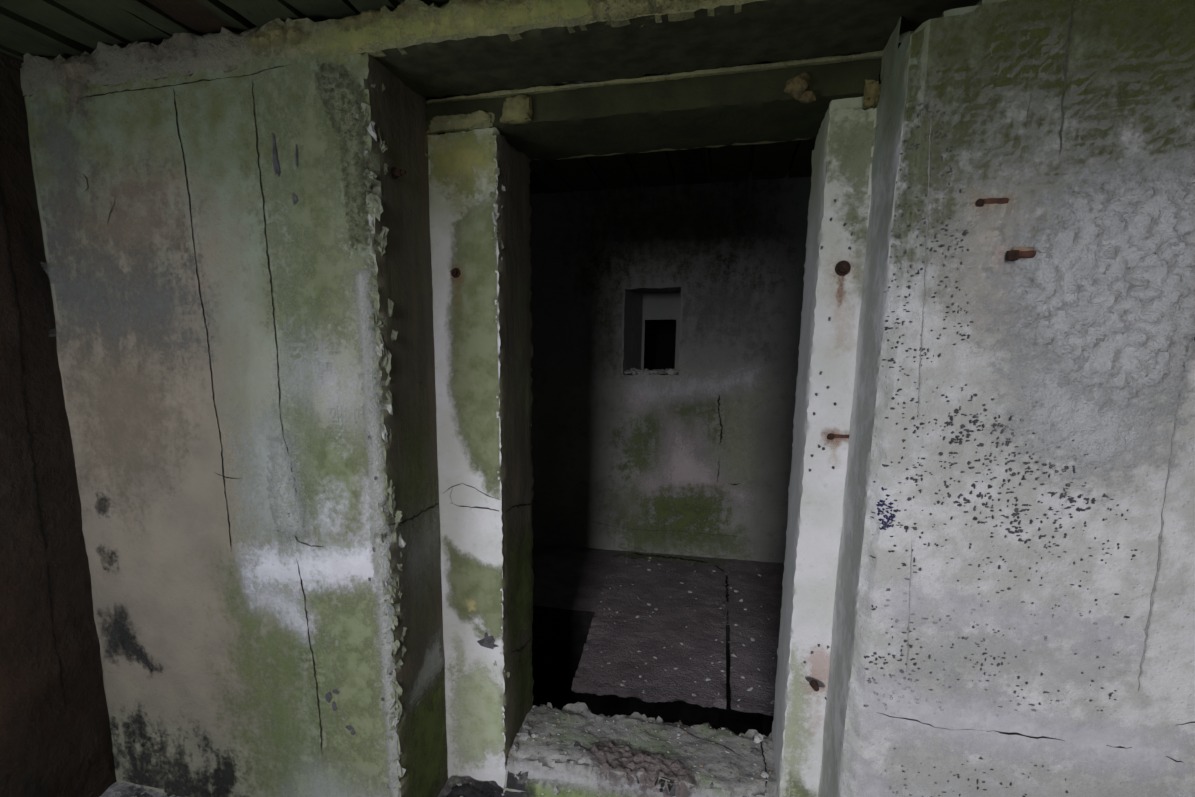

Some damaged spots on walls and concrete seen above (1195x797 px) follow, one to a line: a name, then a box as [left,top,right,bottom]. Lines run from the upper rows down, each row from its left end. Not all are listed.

damp [236,320,383,763]
damp [404,633,463,715]
crack [876,712,1065,741]